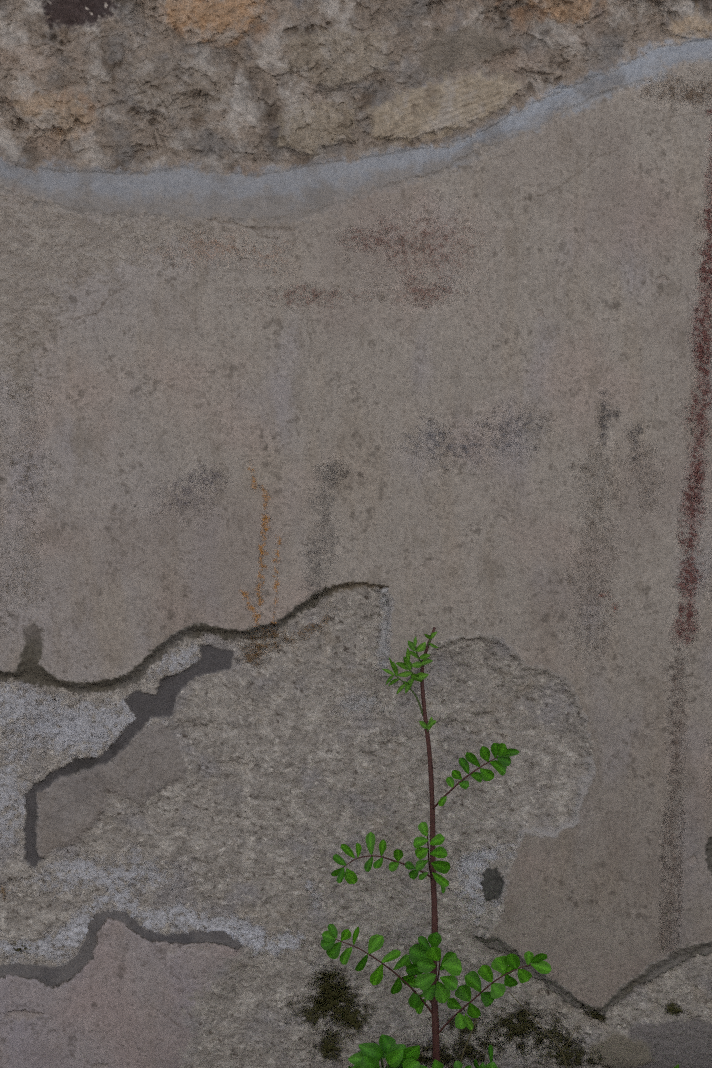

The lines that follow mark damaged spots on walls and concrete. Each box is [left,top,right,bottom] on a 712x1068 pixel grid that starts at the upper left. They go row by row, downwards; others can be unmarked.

spalling [0,0,712,176]
spalling [0,581,712,1068]